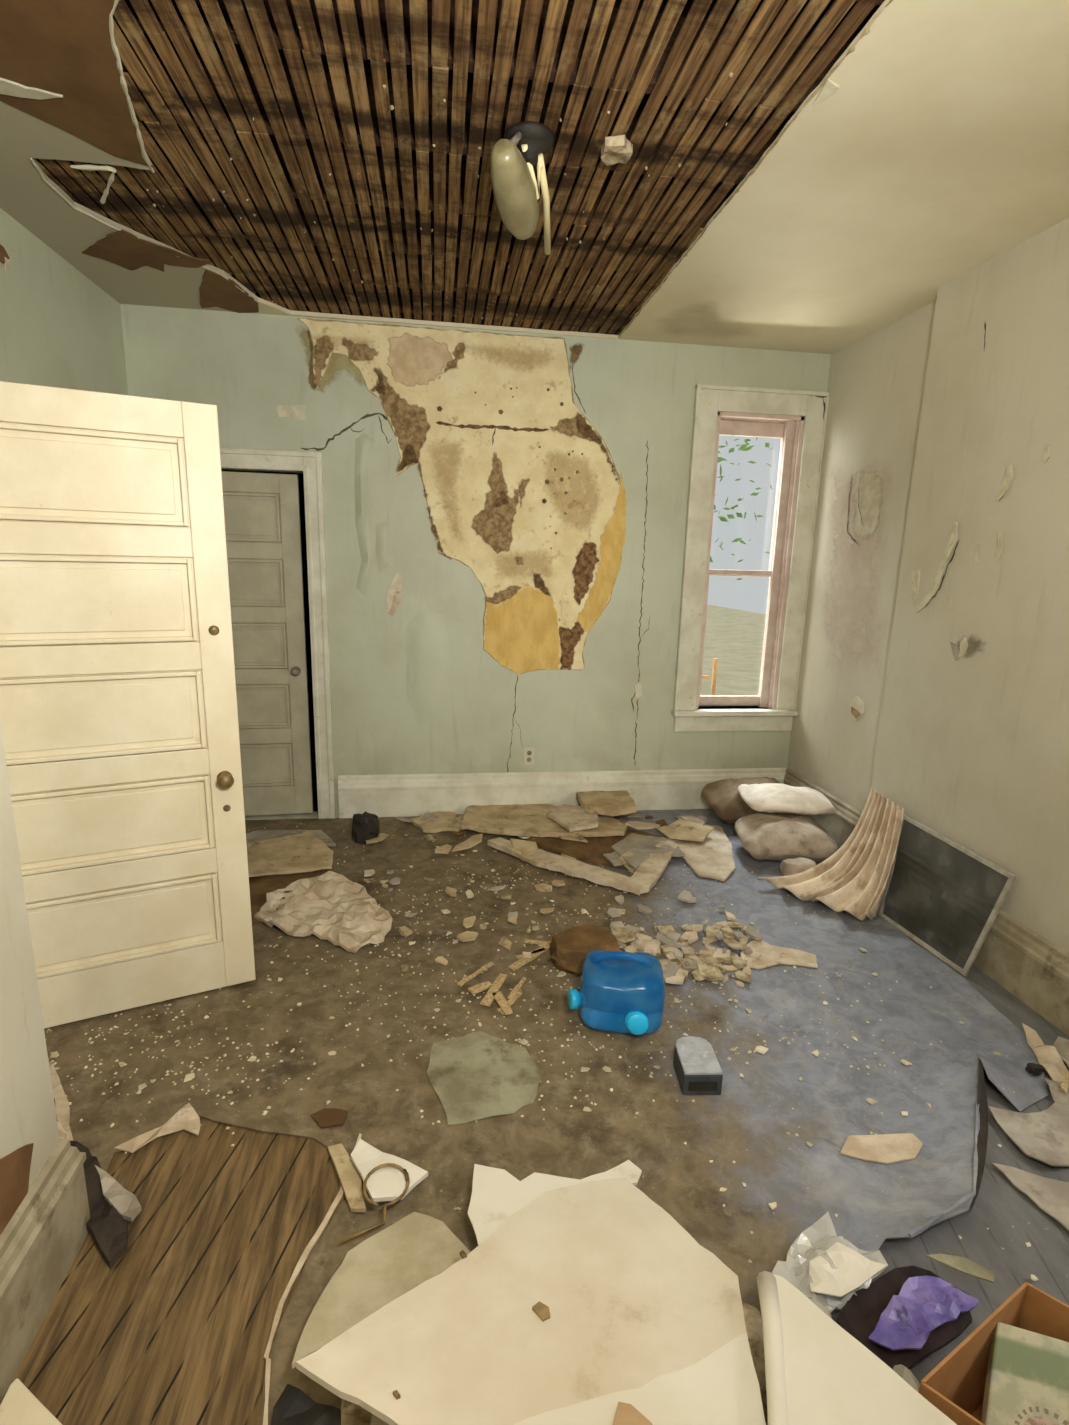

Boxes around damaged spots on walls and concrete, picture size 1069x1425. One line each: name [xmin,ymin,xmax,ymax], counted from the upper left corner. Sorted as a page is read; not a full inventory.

crack [301,413,392,451]
flaking render [30,0,893,674]
crack [631,442,650,764]
peeling [910,434,968,613]